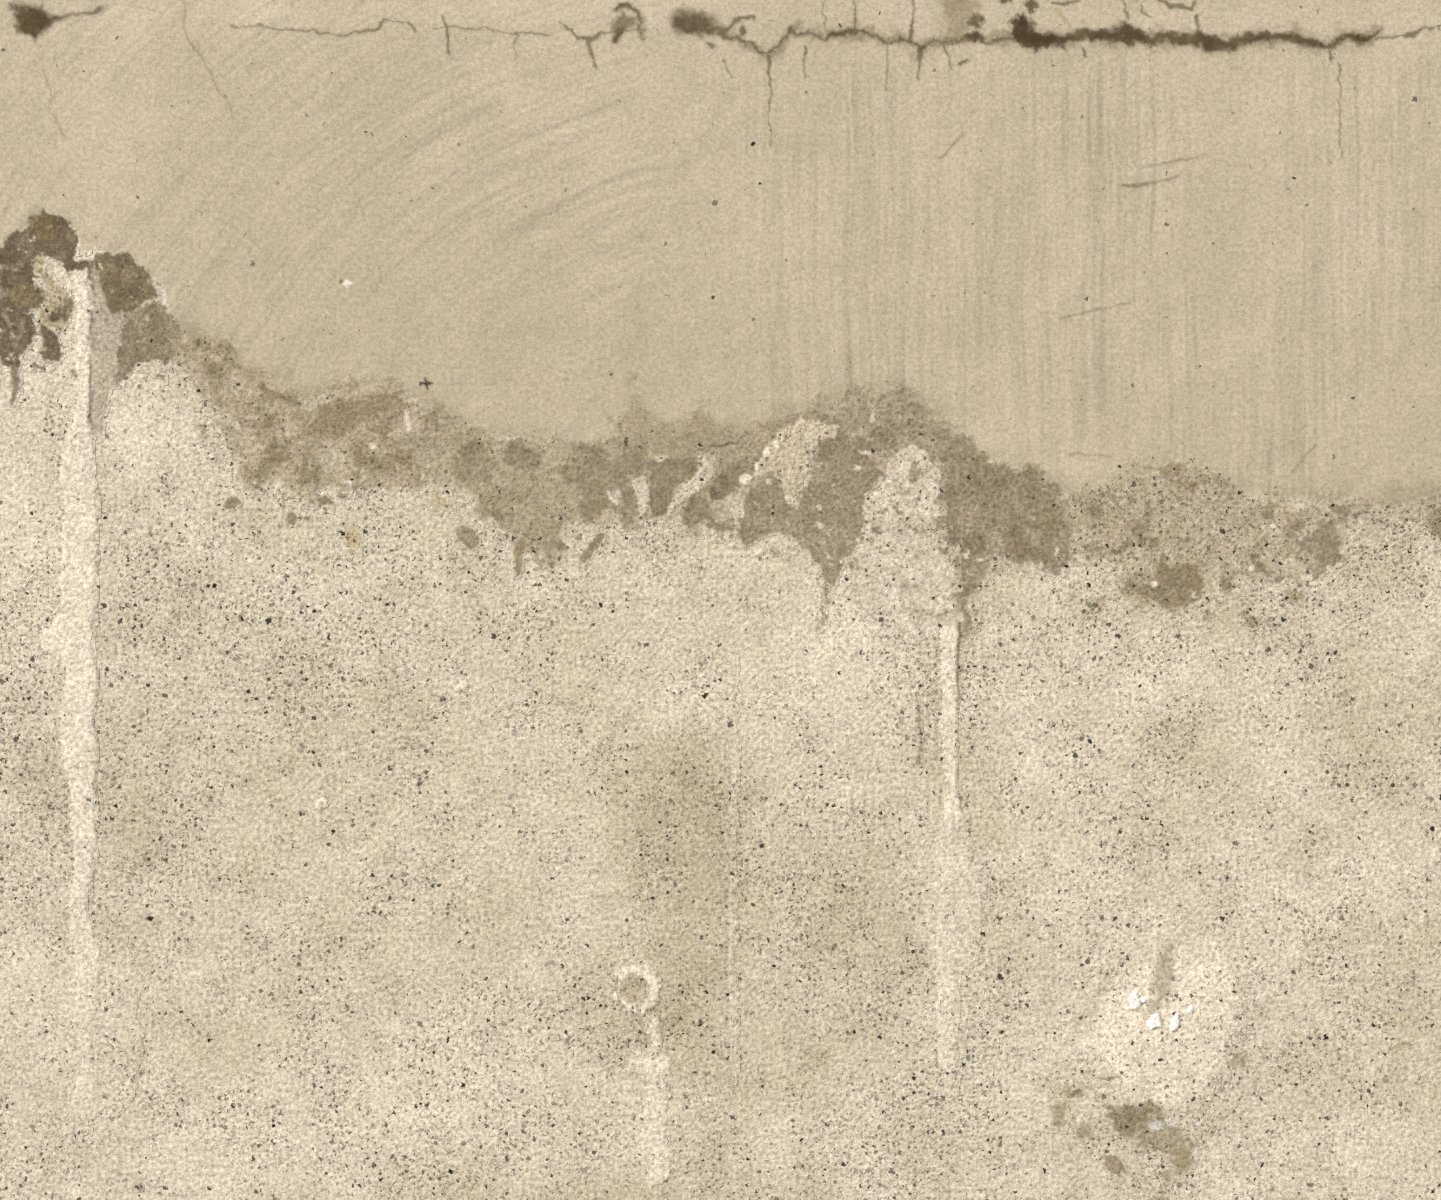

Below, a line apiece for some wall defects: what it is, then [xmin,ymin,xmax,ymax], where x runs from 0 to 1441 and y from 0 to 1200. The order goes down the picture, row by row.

water stain [5,0,107,47]
water stain [604,0,648,45]
water stain [665,2,725,42]
water stain [932,0,1041,51]
crack [698,0,1441,162]
peeling [0,206,1441,648]
water stain [40,266,102,1104]
water stain [936,621,963,815]
water stain [724,649,741,1085]
water stain [624,1012,676,1189]
water stain [1048,1081,1209,1200]
water stain [1224,1045,1250,1070]